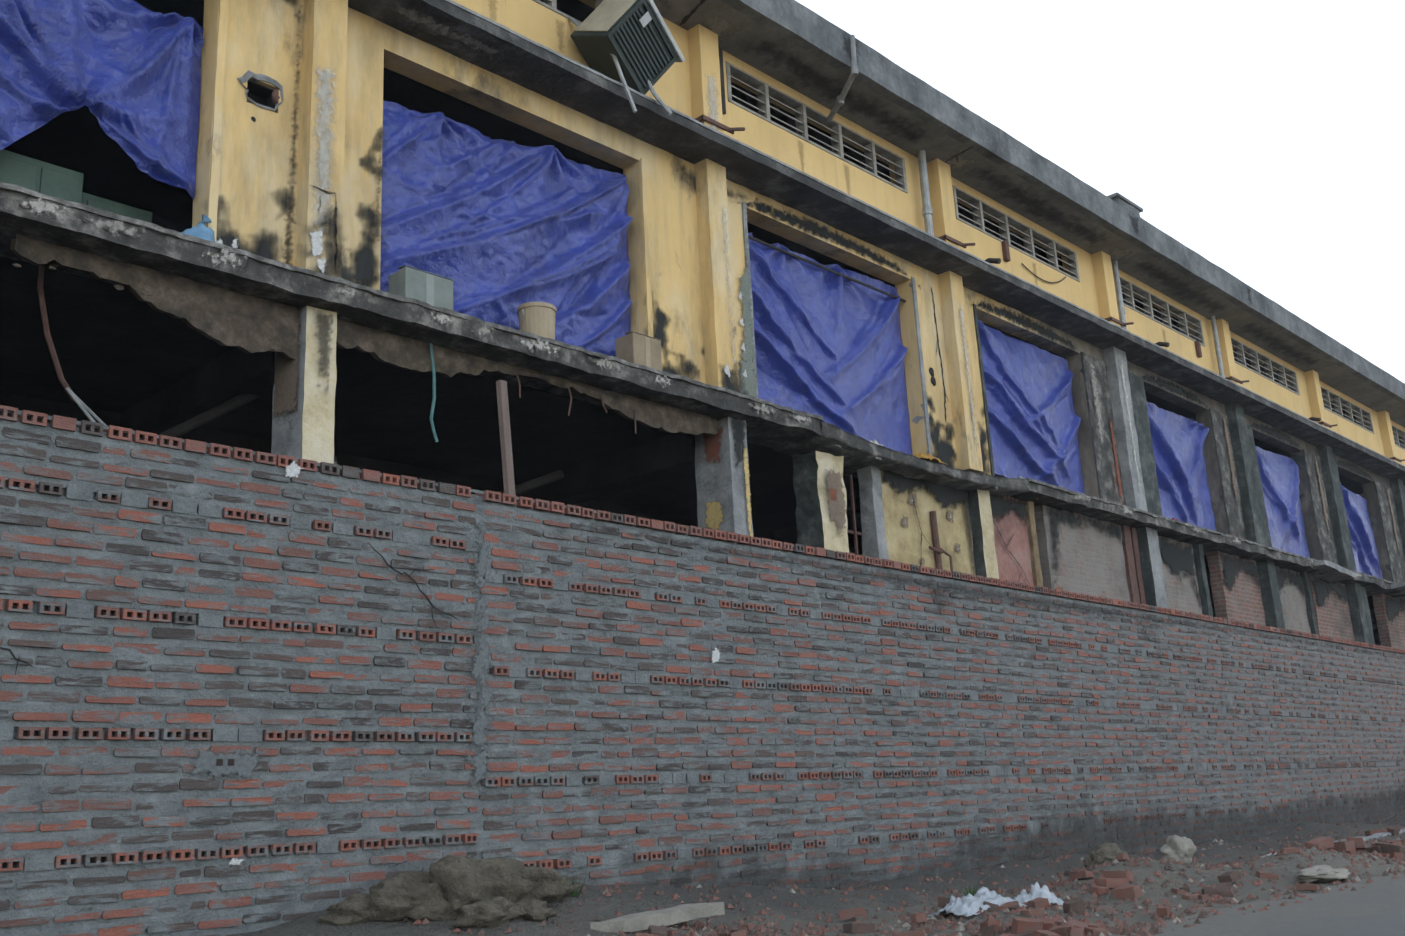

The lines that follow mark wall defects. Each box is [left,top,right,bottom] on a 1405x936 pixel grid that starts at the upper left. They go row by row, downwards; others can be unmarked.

spalling [19,198,67,216]
spalling [83,219,144,236]
spalling [10,234,298,360]
crack [368,543,460,628]